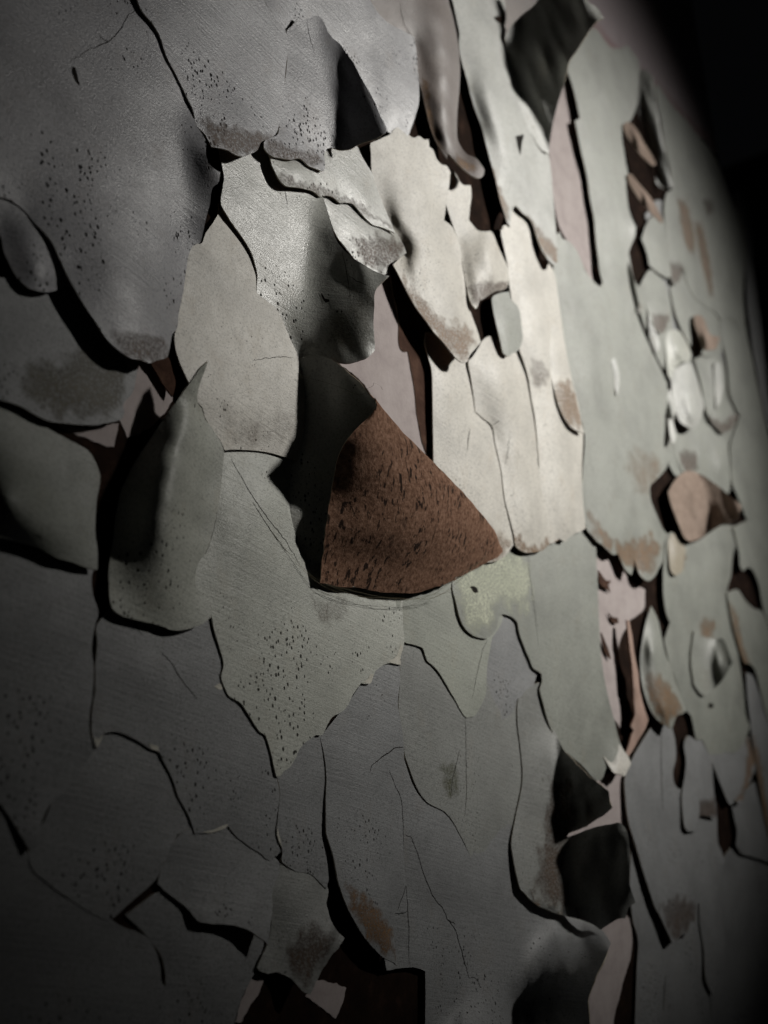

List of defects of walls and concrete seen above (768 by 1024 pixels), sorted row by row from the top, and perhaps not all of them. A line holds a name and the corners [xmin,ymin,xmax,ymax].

peeling [0,406,632,1024]
peeling [136,0,503,593]
crack [370,747,481,987]
peeling [264,0,768,1024]